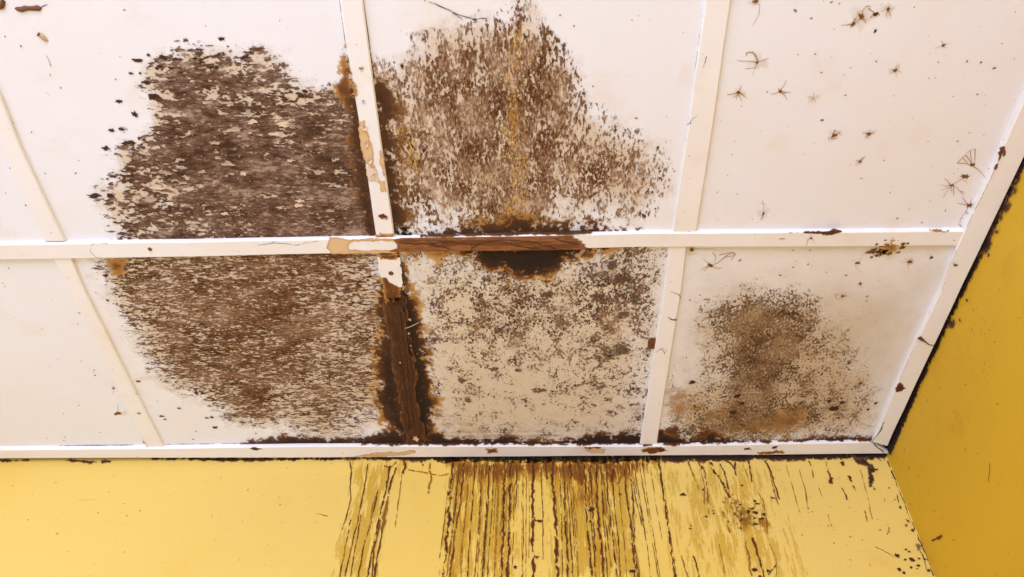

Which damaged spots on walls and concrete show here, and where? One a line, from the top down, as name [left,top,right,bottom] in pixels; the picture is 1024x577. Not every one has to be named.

leakage [87,37,376,240]
peeling [358,121,387,192]
leakage [372,0,676,235]
peeling [327,231,593,304]
leakage [93,247,983,577]
peeling [851,455,878,490]